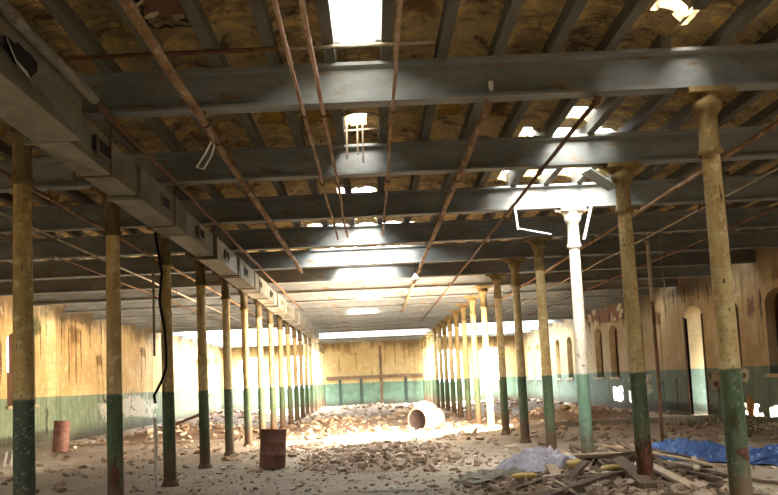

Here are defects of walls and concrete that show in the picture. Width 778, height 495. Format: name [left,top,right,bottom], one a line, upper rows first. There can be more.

spalling [133,0,193,30]
flaking render [585,303,625,331]
peeling [93,401,107,422]
peeling [123,389,159,420]
rust [636,435,653,475]